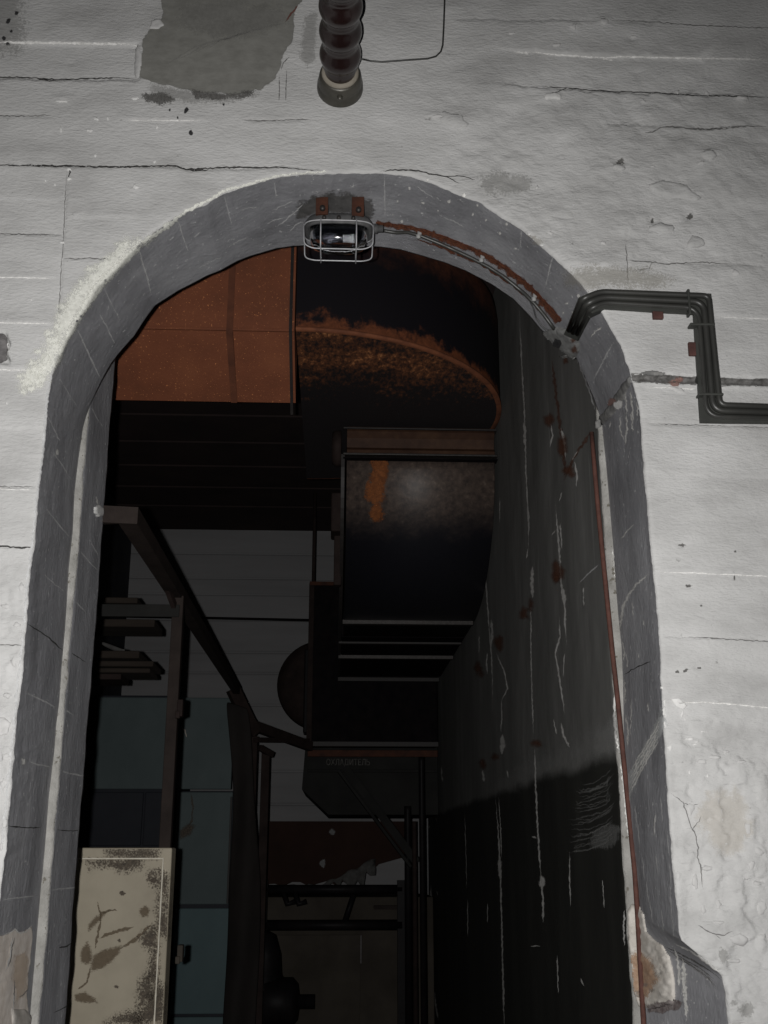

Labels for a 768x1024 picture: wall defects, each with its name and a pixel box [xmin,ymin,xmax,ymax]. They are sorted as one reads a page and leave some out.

peeling [149,19,164,29]
crack [545,86,761,98]
crack [645,125,762,133]
rust [376,220,562,324]
efflorescence [1,170,326,842]
rust [364,461,389,522]
crack [672,794,703,887]
spalling [0,926,32,1024]
spalling [627,904,689,1020]